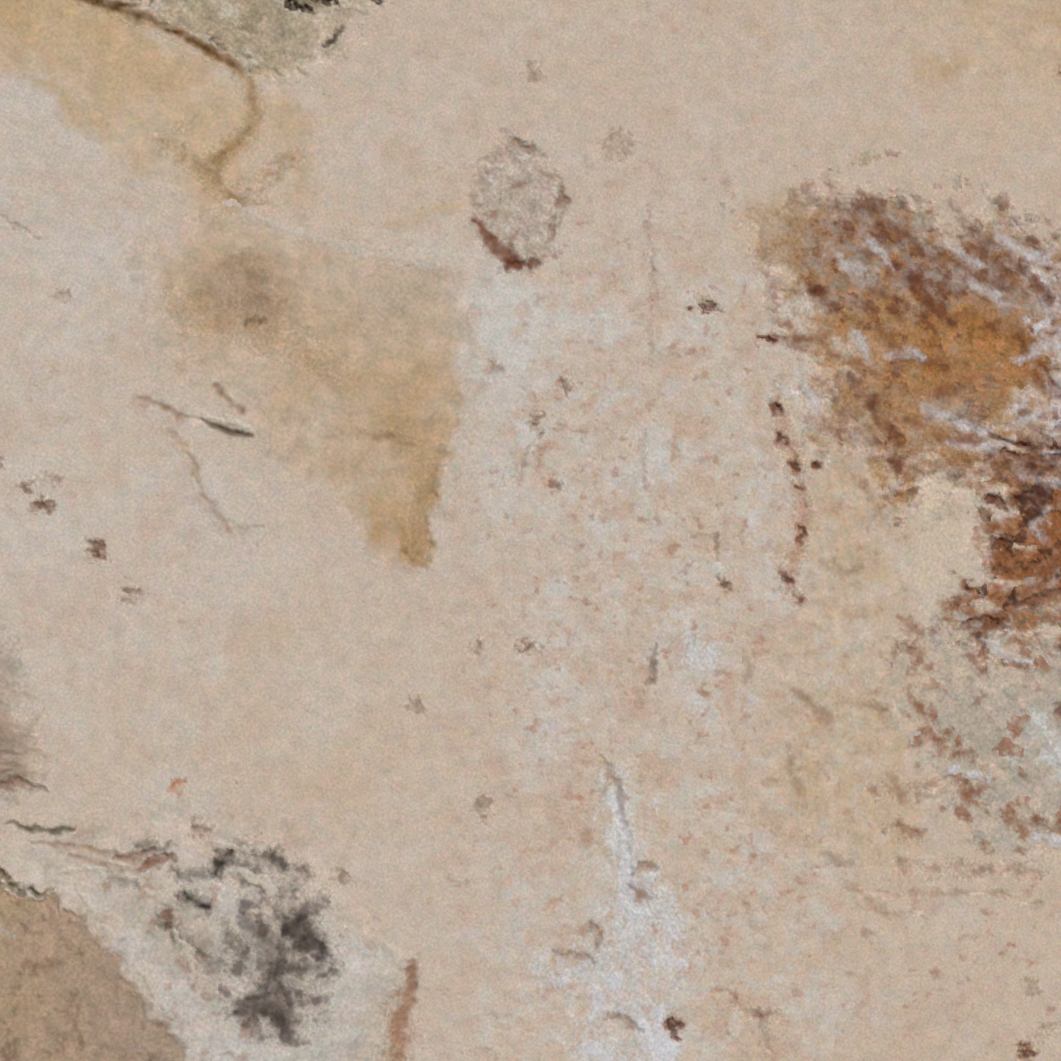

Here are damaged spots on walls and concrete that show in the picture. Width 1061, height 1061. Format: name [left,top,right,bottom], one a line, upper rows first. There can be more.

damp [0,0,243,216]
spalling [128,0,396,96]
damp [225,63,325,219]
peeling [114,124,574,578]
rust [719,148,1061,672]
damp [1002,209,1061,436]
spalling [116,584,150,608]
spalling [0,613,60,816]
spalling [185,813,216,841]
spalling [467,790,496,829]
spalling [0,883,210,1061]
damp [128,825,349,1050]